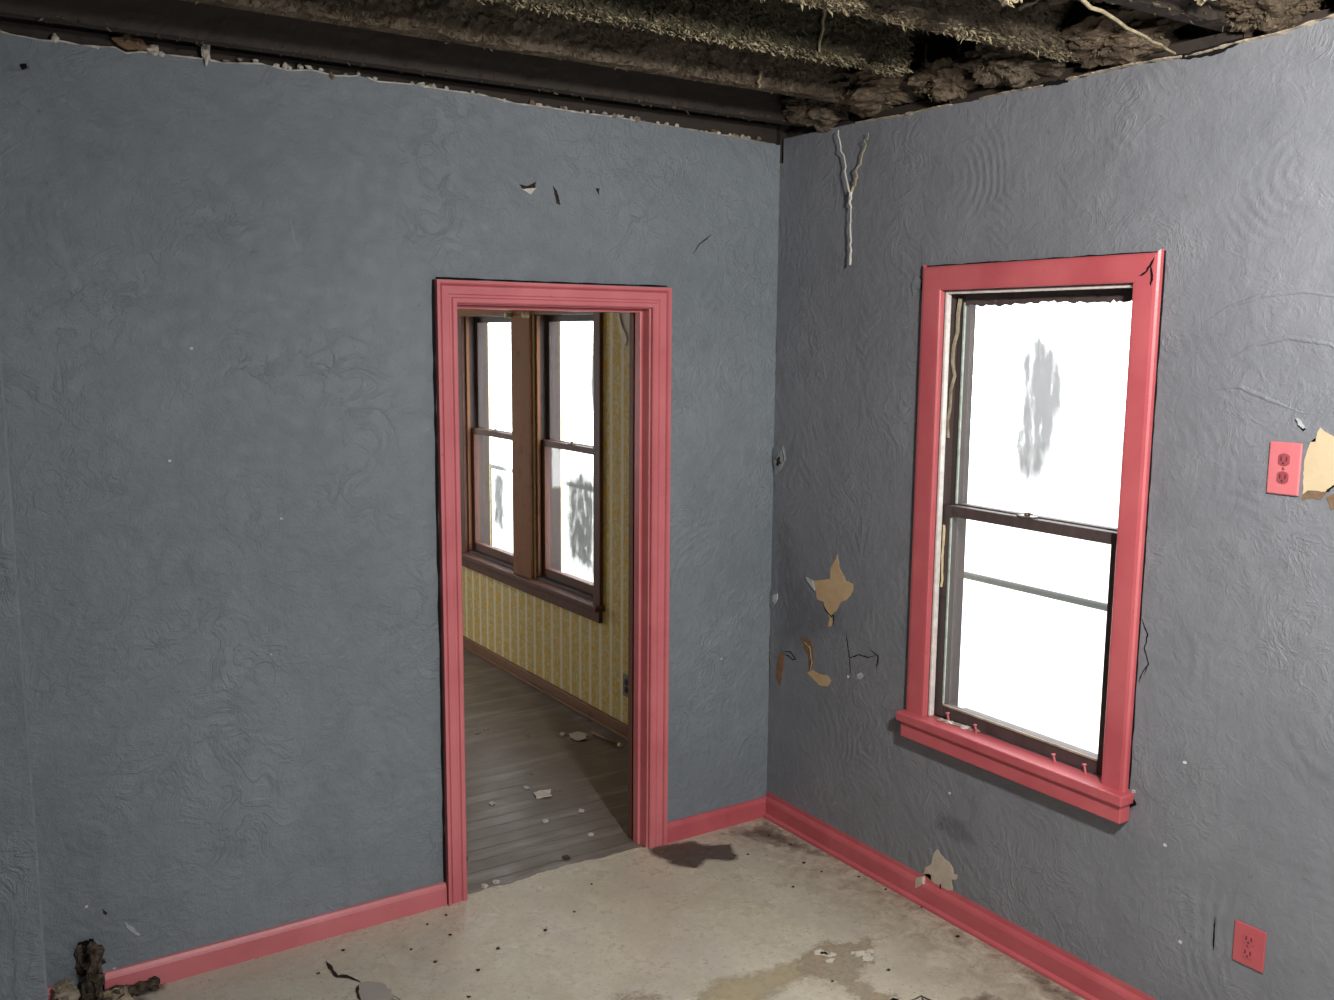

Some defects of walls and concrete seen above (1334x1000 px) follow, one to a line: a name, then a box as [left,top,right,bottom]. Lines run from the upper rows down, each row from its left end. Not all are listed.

spalling [0,29,774,145]
spalling [855,104,953,124]
spalling [979,14,1334,99]
peeling [1295,418,1334,510]
peeling [806,555,853,627]
peeling [776,637,831,686]
peeling [915,849,957,891]